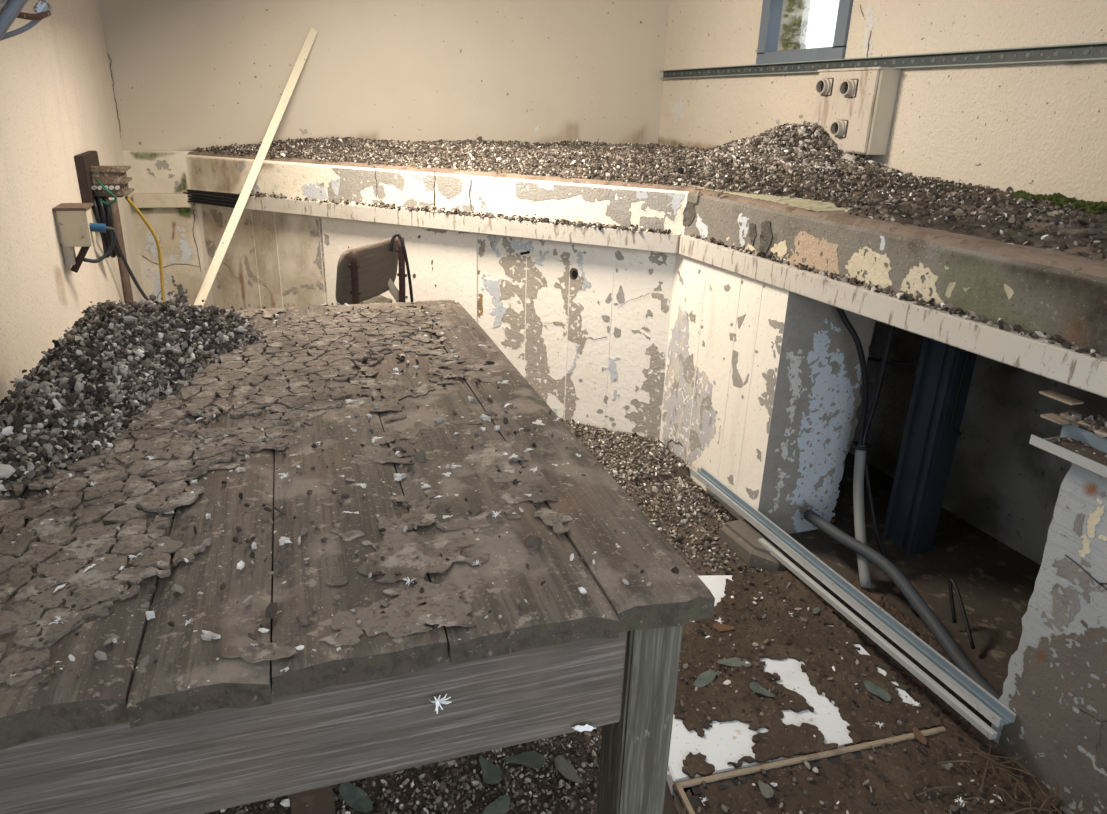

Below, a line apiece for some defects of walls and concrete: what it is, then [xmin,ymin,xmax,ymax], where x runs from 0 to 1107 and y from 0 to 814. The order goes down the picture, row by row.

peeling [301,168,486,213]
peeling [516,181,708,238]
peeling [726,213,969,306]
peeling [418,228,721,471]
peeling [723,314,749,399]
peeling [758,318,861,533]
peeling [727,475,759,500]
crack [1065,554,1107,590]
peeling [999,492,1107,814]